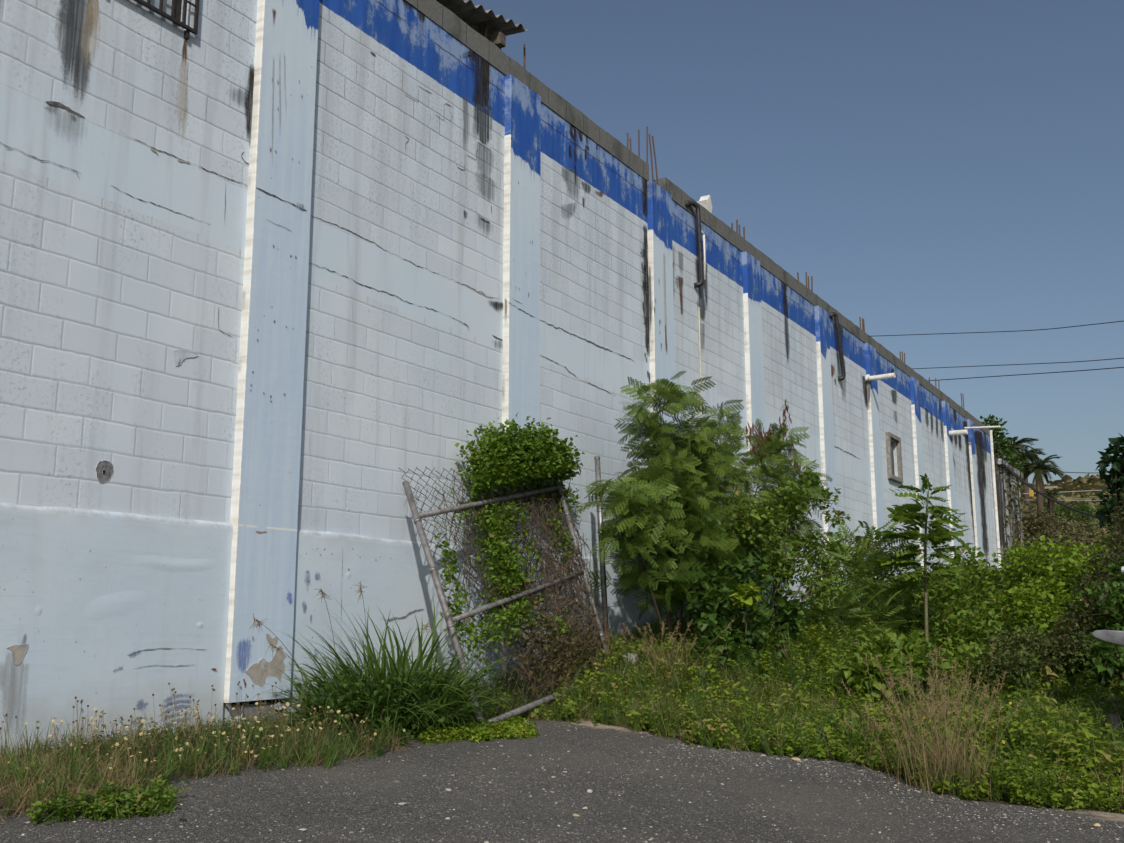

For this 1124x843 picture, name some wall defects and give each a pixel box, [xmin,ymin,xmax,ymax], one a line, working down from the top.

leakage [62,0,90,83]
leakage [245,66,254,137]
leakage [467,50,492,144]
crack [0,142,80,179]
spalling [627,126,658,184]
crack [111,133,635,362]
leakage [641,178,652,357]
leakage [696,259,707,319]
spalling [95,460,114,484]
spalling [7,644,28,665]
peeling [226,633,286,720]